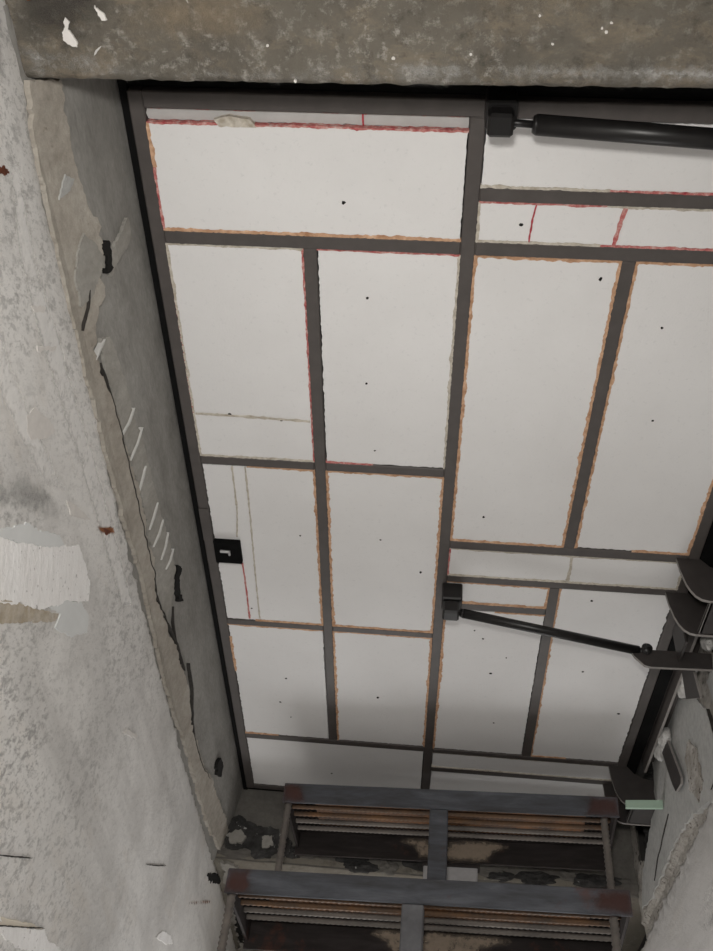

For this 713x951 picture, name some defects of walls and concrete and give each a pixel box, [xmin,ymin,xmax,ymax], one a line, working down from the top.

flaking render [0,522,90,637]
peeling [0,917,61,951]